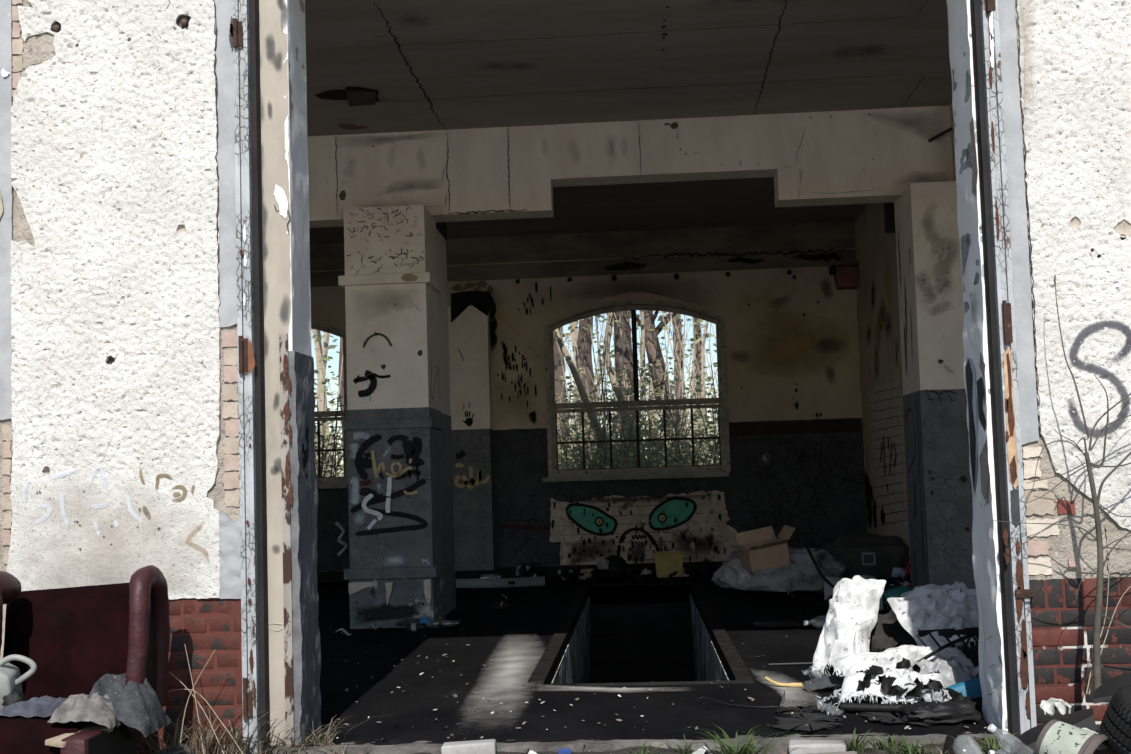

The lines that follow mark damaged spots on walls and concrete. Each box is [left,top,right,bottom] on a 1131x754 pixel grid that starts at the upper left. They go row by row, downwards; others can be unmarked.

spalling [1,0,56,105]
crack [318,0,936,215]
spalling [0,188,35,246]
spalling [274,185,288,218]
spalling [0,419,13,572]
spalling [207,325,240,522]
spalling [1022,437,1131,581]